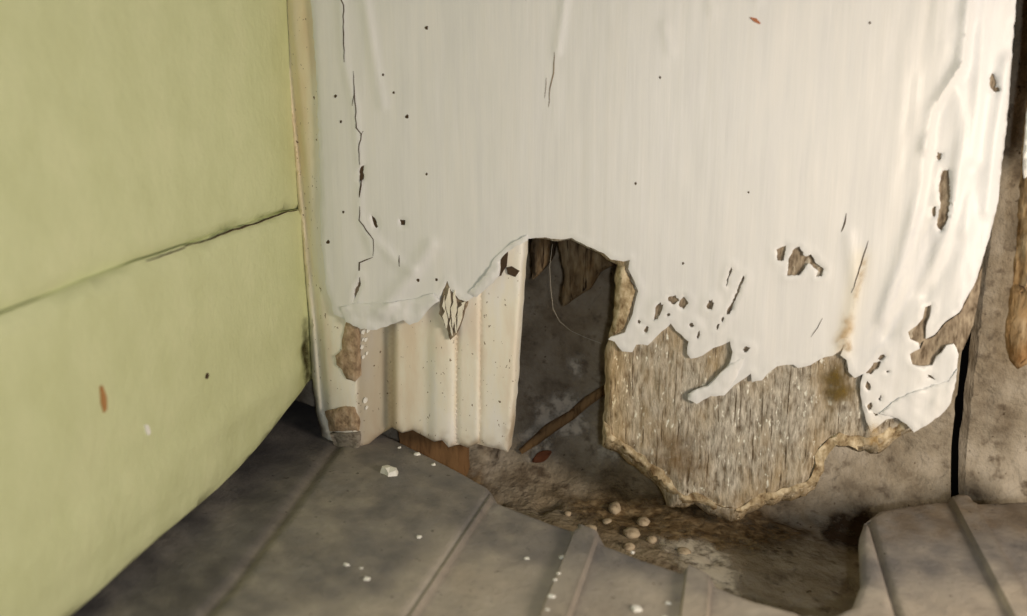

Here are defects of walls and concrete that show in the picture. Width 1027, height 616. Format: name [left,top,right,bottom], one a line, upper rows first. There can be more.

crack [341,0,374,281]
crack [146,210,297,261]
peeling [497,252,519,278]
peeling [777,246,823,276]
spalling [611,265,688,334]
peeling [335,278,440,382]
peeling [688,346,750,404]
peeling [865,267,983,432]
spalling [325,406,361,448]
peeling [380,465,398,477]